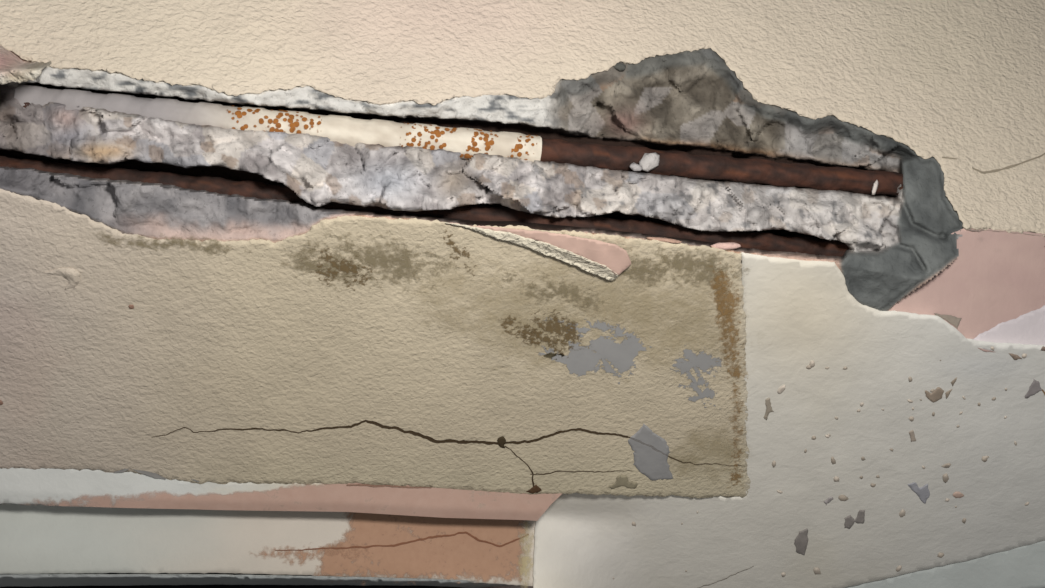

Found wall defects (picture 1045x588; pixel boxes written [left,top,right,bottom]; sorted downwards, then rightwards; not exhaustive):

rust [228,107,322,134]
rust [401,123,457,150]
rust [460,129,498,160]
spalling [0,48,1045,360]
leakage [295,230,474,291]
leakage [621,254,723,286]
leakage [501,283,594,354]
spalling [907,378,965,442]
crack [114,468,166,479]
crack [155,420,741,487]
peeling [609,424,673,489]
crack [278,532,529,551]